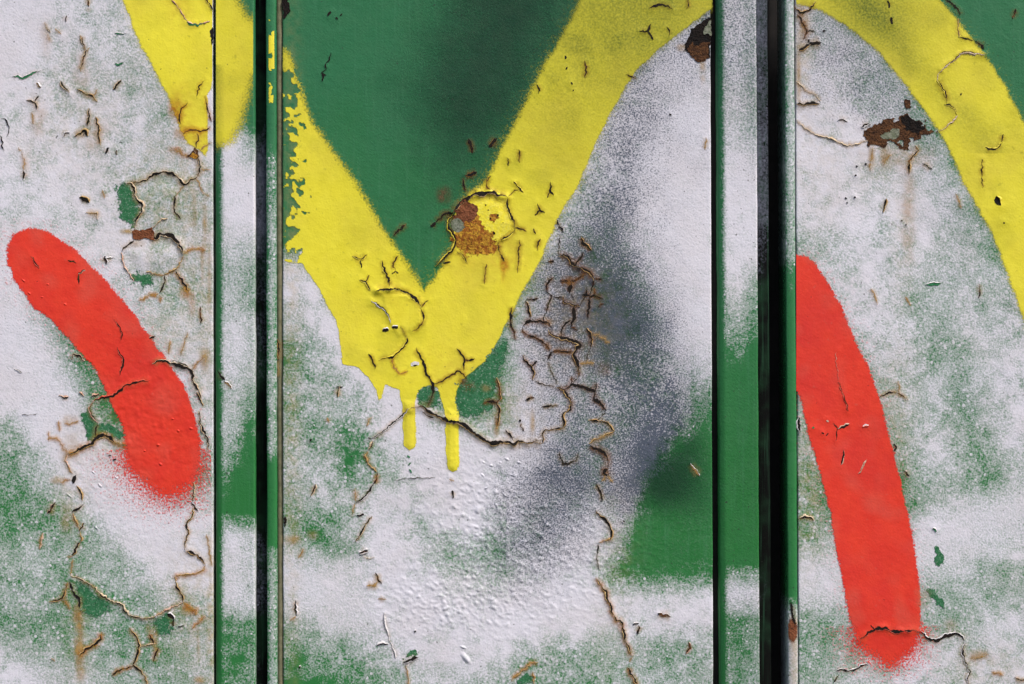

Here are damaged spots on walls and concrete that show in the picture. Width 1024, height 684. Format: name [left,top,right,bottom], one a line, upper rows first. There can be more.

crack [22,82,232,576]
crack [352,138,637,684]
crack [79,631,102,657]
crack [113,482,213,684]
crack [860,626,1024,684]